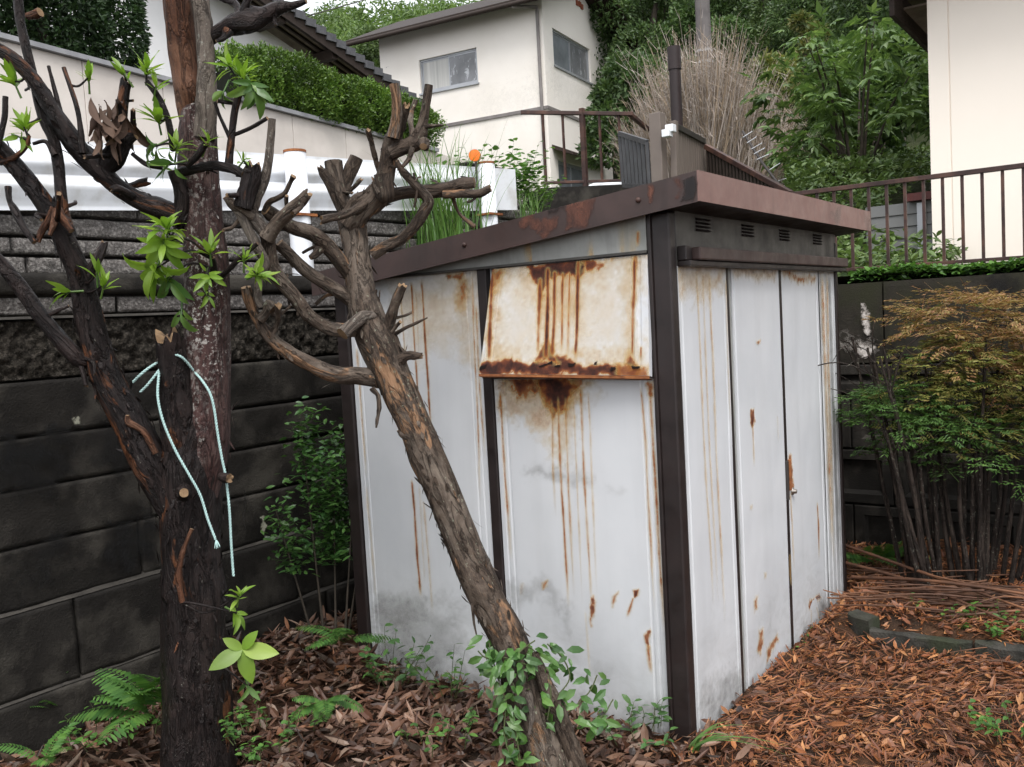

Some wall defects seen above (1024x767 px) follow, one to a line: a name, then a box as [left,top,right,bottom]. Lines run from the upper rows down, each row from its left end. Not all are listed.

corrosion [403,284,431,420]
corrosion [447,256,662,587]
corrosion [411,482,429,590]
corrosion [758,630,778,662]